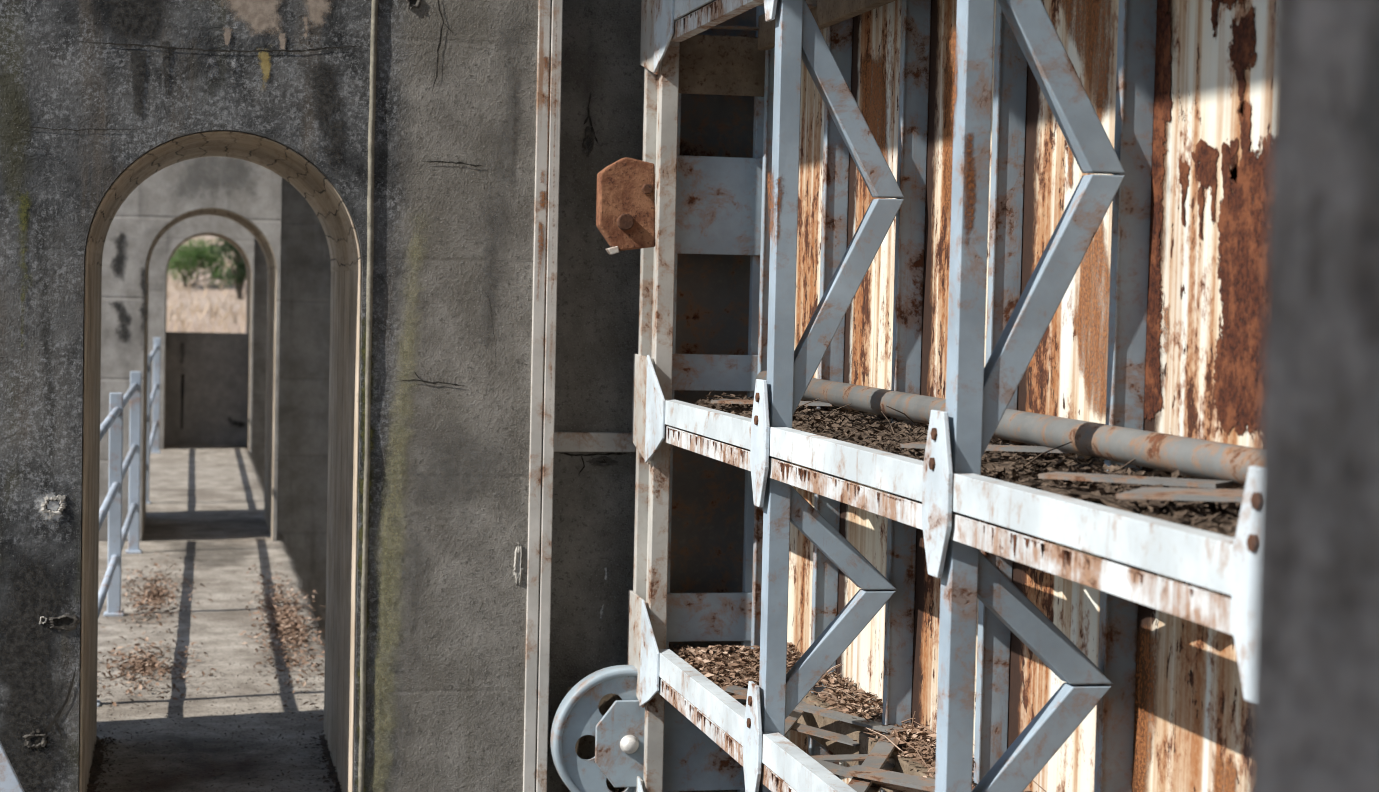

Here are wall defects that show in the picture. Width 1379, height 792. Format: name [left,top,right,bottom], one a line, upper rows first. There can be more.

water stain [104,0,170,116]
corrosion [1059,0,1111,121]
crack [422,160,482,168]
corrosion [537,83,556,296]
corrosion [1144,0,1271,439]
corrosion [1073,220,1110,419]
corrosion [668,428,743,462]
corrosion [778,462,912,509]
corrosion [1010,533,1045,556]
water stain [375,509,388,775]
corrosion [1132,630,1158,792]
corrosion [1212,755,1236,792]